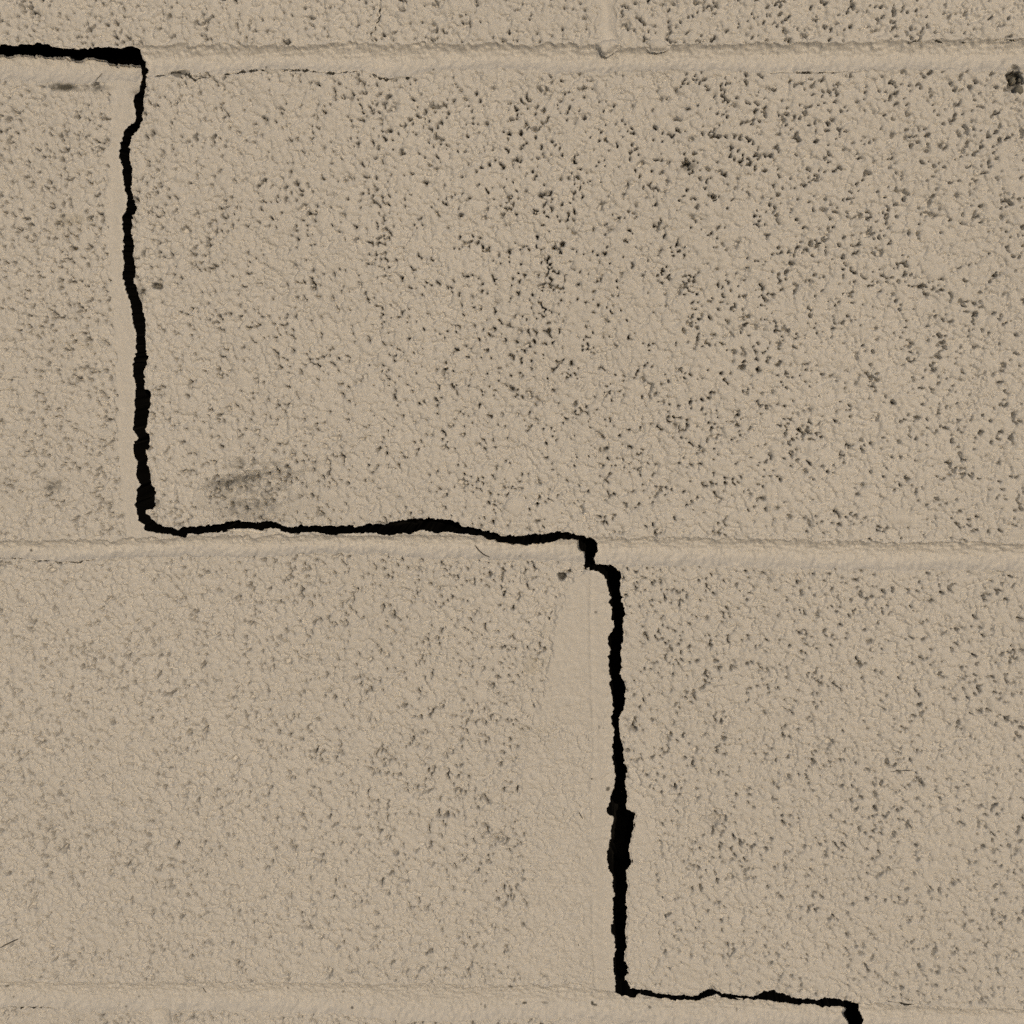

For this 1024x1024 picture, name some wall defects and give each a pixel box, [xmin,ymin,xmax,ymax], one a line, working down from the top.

crack [0,42,582,549]
crack [770,68,859,76]
crack [581,535,864,1024]